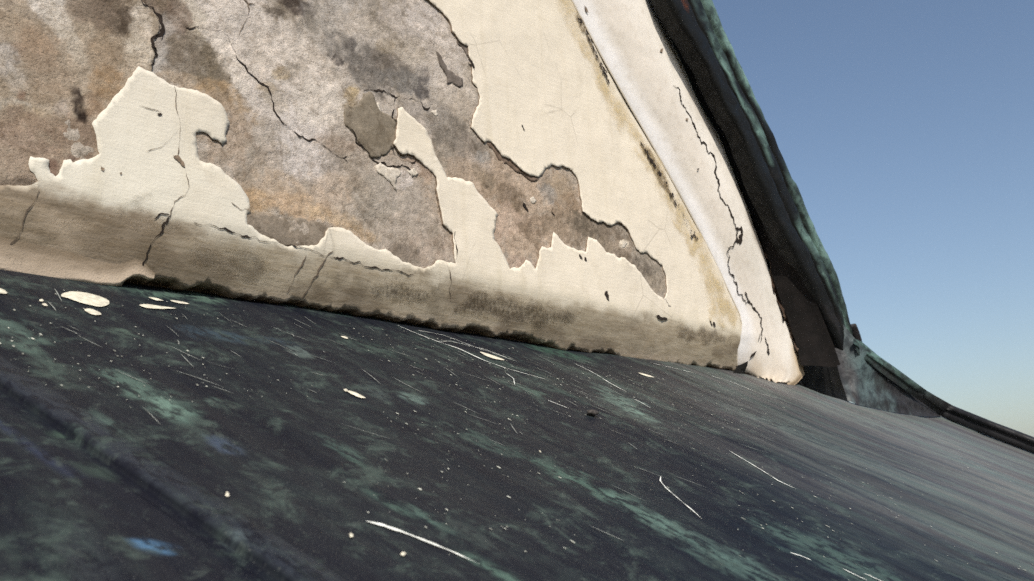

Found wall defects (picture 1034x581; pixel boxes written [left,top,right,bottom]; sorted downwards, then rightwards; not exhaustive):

crack [142,86,414,298]
crack [141,0,416,175]
peeling [0,0,666,298]
crack [367,89,430,121]
spalling [641,142,698,240]
crack [673,85,770,354]